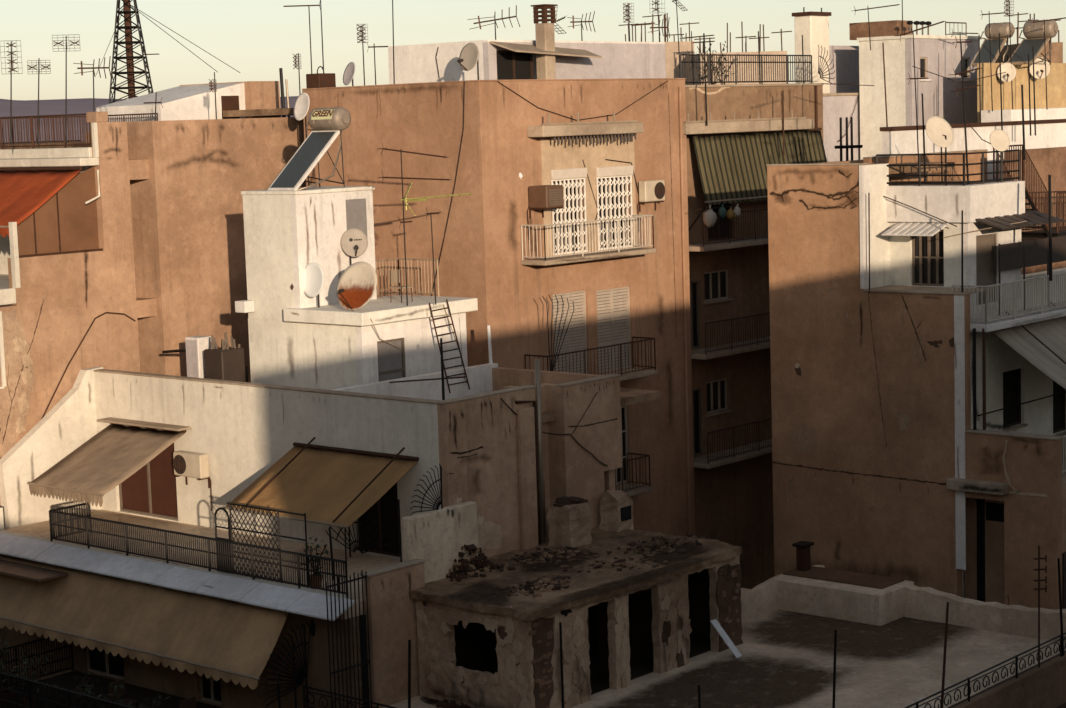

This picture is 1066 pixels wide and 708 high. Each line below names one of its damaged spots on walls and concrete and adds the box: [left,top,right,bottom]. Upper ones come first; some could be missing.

crack [770,170,859,210]
crack [901,295,927,361]
crack [568,418,618,427]
crack [772,462,946,485]
flaking render [438,619,507,686]